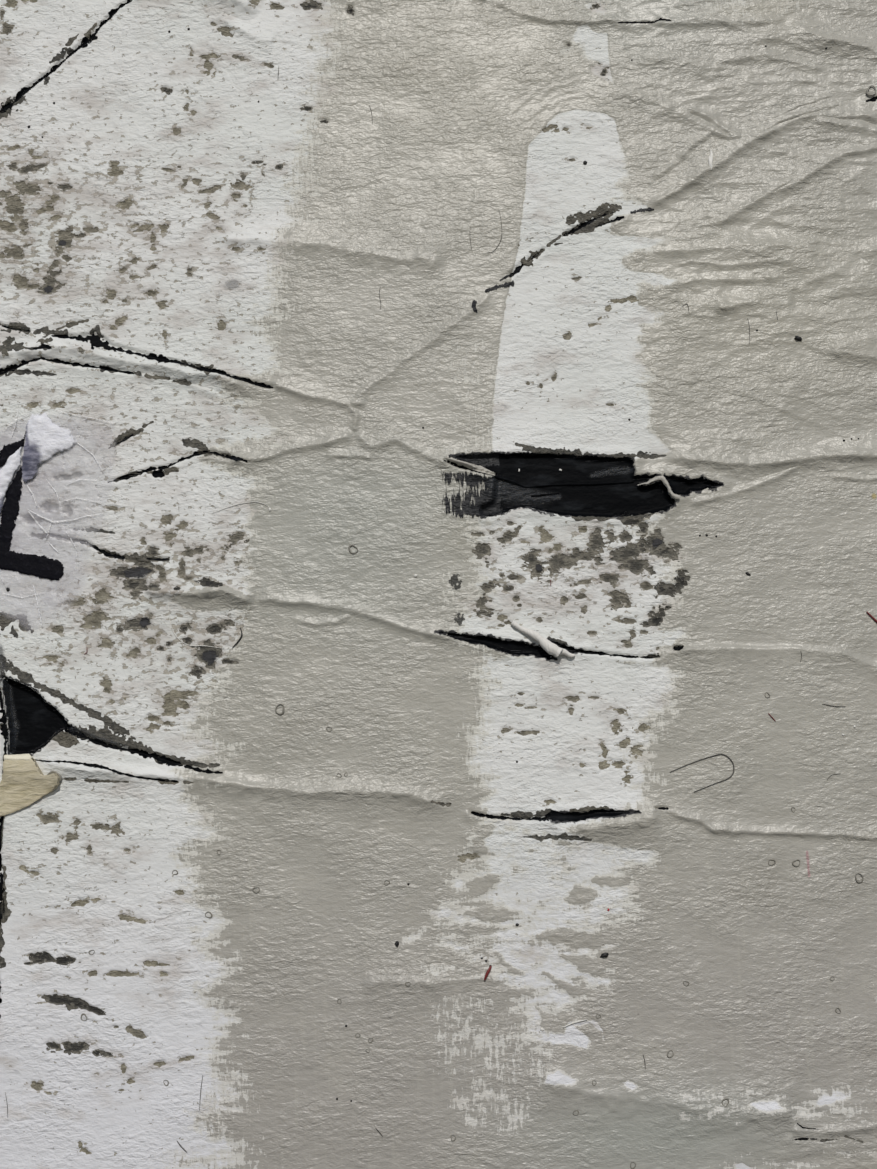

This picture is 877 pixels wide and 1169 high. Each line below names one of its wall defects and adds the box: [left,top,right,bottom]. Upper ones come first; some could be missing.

crack [0,0,132,119]
crack [472,202,654,313]
crack [0,319,273,388]
peeling [21,501,77,525]
peeling [53,472,83,480]
crack [0,816,12,1018]